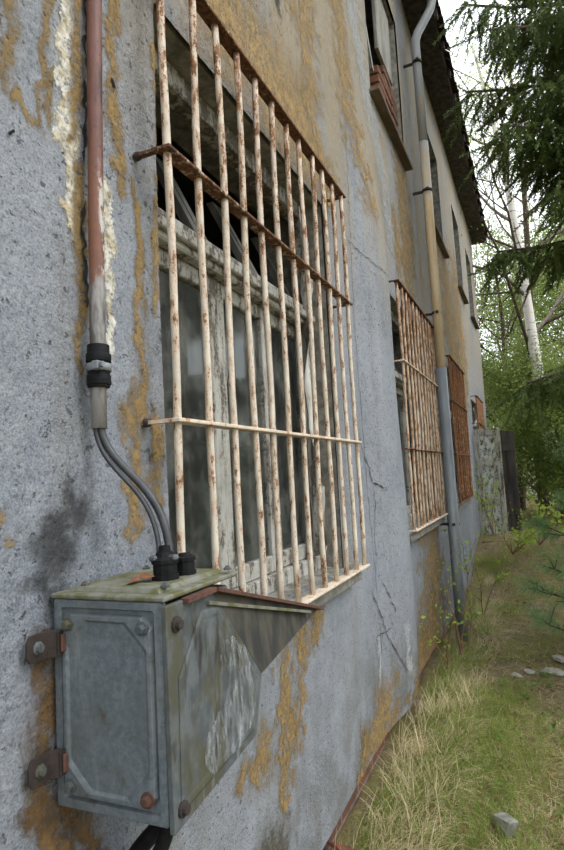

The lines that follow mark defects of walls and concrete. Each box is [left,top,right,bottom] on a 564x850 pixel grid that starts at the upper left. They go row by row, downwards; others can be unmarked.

leakage [0,0,56,126]
leakage [66,0,83,143]
leakage [196,0,338,197]
leakage [347,0,395,247]
leakage [72,162,88,374]
leakage [104,0,166,543]
rust [30,658,56,758]
rust [273,610,324,814]
crack [373,581,410,677]
rust [17,782,102,850]